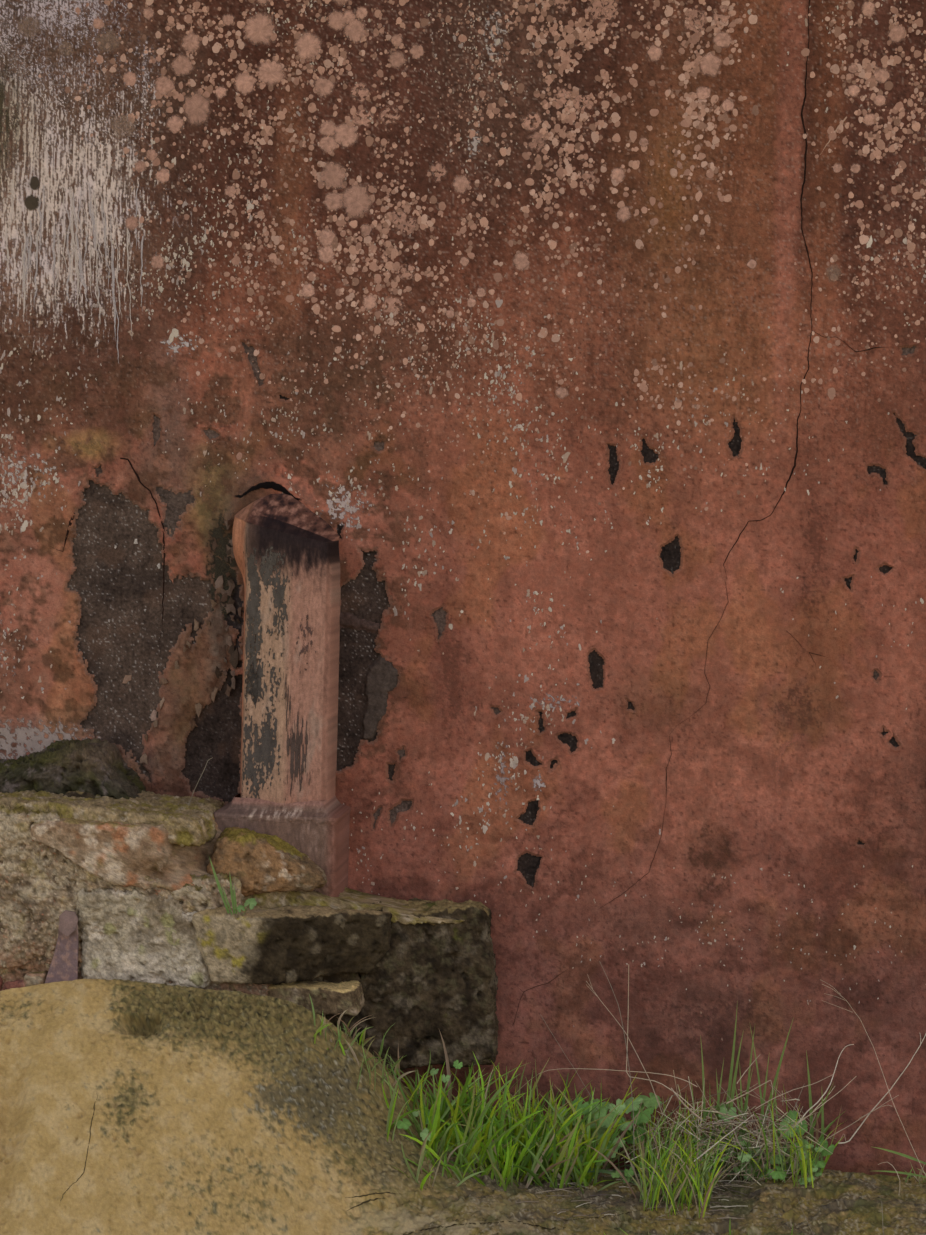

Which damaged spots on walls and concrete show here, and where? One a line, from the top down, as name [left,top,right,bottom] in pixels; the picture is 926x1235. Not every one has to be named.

damp [483,11,508,68]
damp [0,0,171,363]
spalling [601,433,664,490]
spalling [722,410,747,462]
crack [602,0,881,907]
spalling [889,407,926,473]
spalling [655,531,686,581]
spalling [61,462,316,806]
spalling [333,519,417,831]
spalling [583,646,609,694]
spalling [519,704,583,777]
spalling [511,796,544,830]